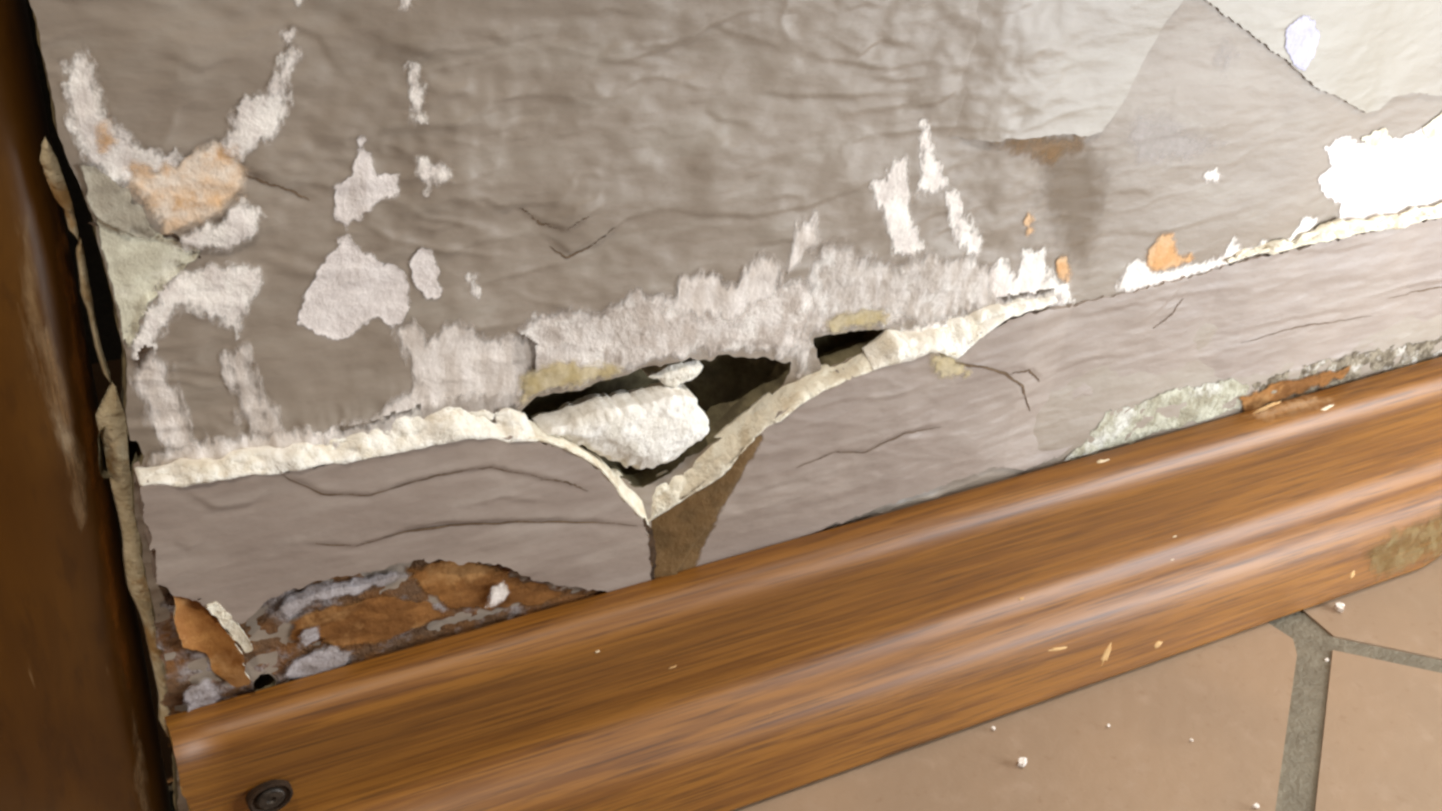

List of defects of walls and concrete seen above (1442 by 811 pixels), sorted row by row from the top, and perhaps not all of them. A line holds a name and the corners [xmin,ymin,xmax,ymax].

peeling [1205,0,1442,113]
peeling [1203,167,1220,182]
peeling [1318,113,1442,221]
flaking render [61,0,1183,467]
peeling [1288,216,1318,241]
peeling [1115,234,1267,293]
spalling [98,426,113,478]
spalling [580,445,646,475]
flaking render [154,559,606,747]